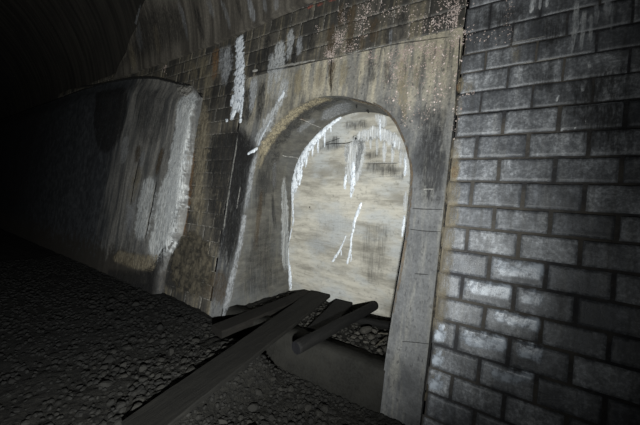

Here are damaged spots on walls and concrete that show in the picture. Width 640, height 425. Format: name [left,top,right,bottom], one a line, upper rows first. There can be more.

crack [329,45,386,88]
leakage [109,93,209,294]
leakage [206,215,246,318]
leakage [219,31,349,290]
leakage [332,202,362,264]
leakage [343,114,409,198]
leakage [419,114,446,200]